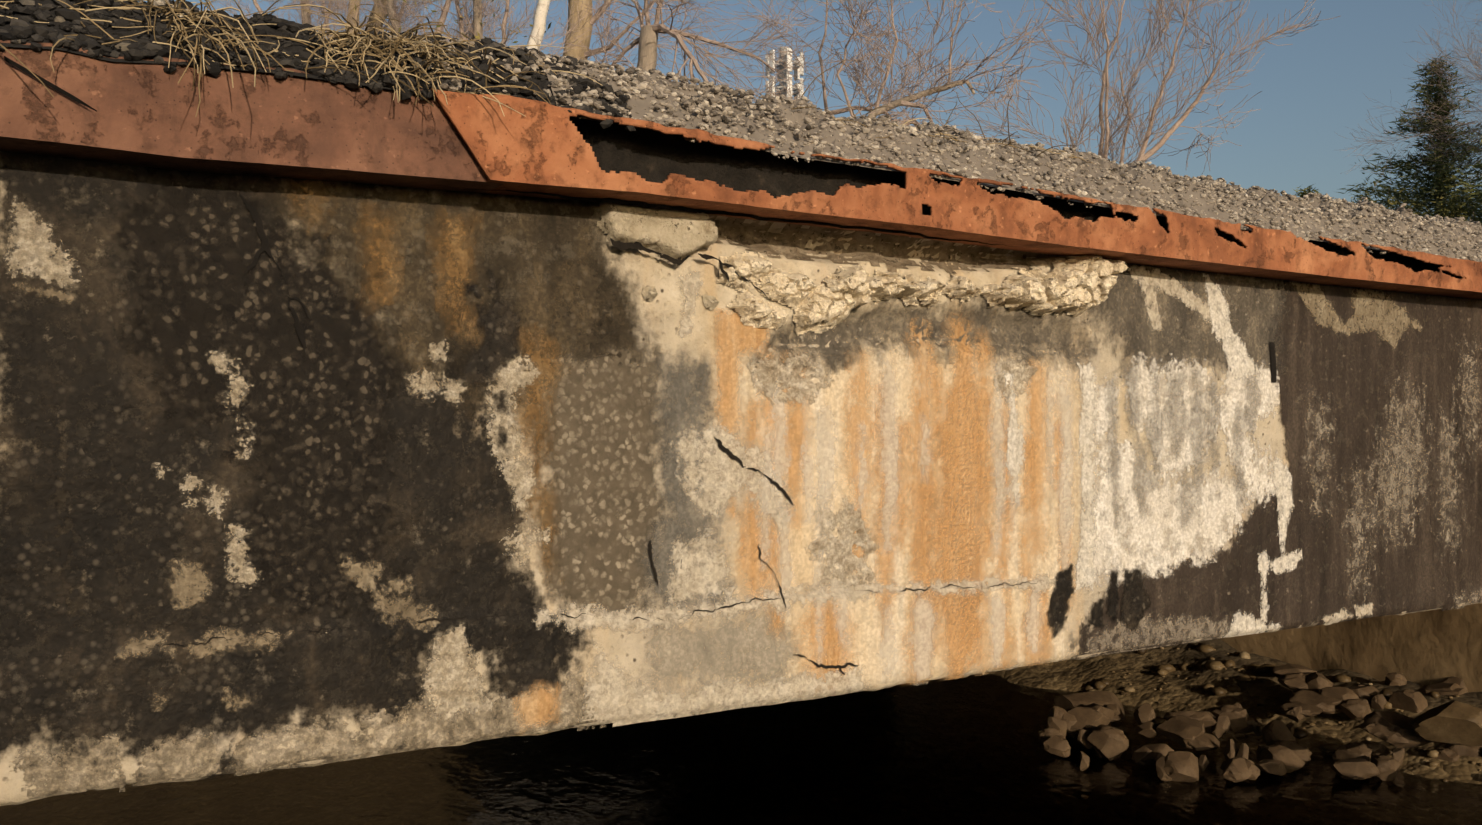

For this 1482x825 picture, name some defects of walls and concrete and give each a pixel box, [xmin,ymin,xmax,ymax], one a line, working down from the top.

corrosion [360,207,400,305]
corrosion [435,215,476,335]
spalling [707,214,1128,406]
corrosion [513,335,559,566]
damp [0,151,1482,779]
crack [714,437,795,505]
corrosion [718,312,1084,697]
crack [11,540,825,666]
crack [794,654,858,675]
crack [862,580,1052,593]